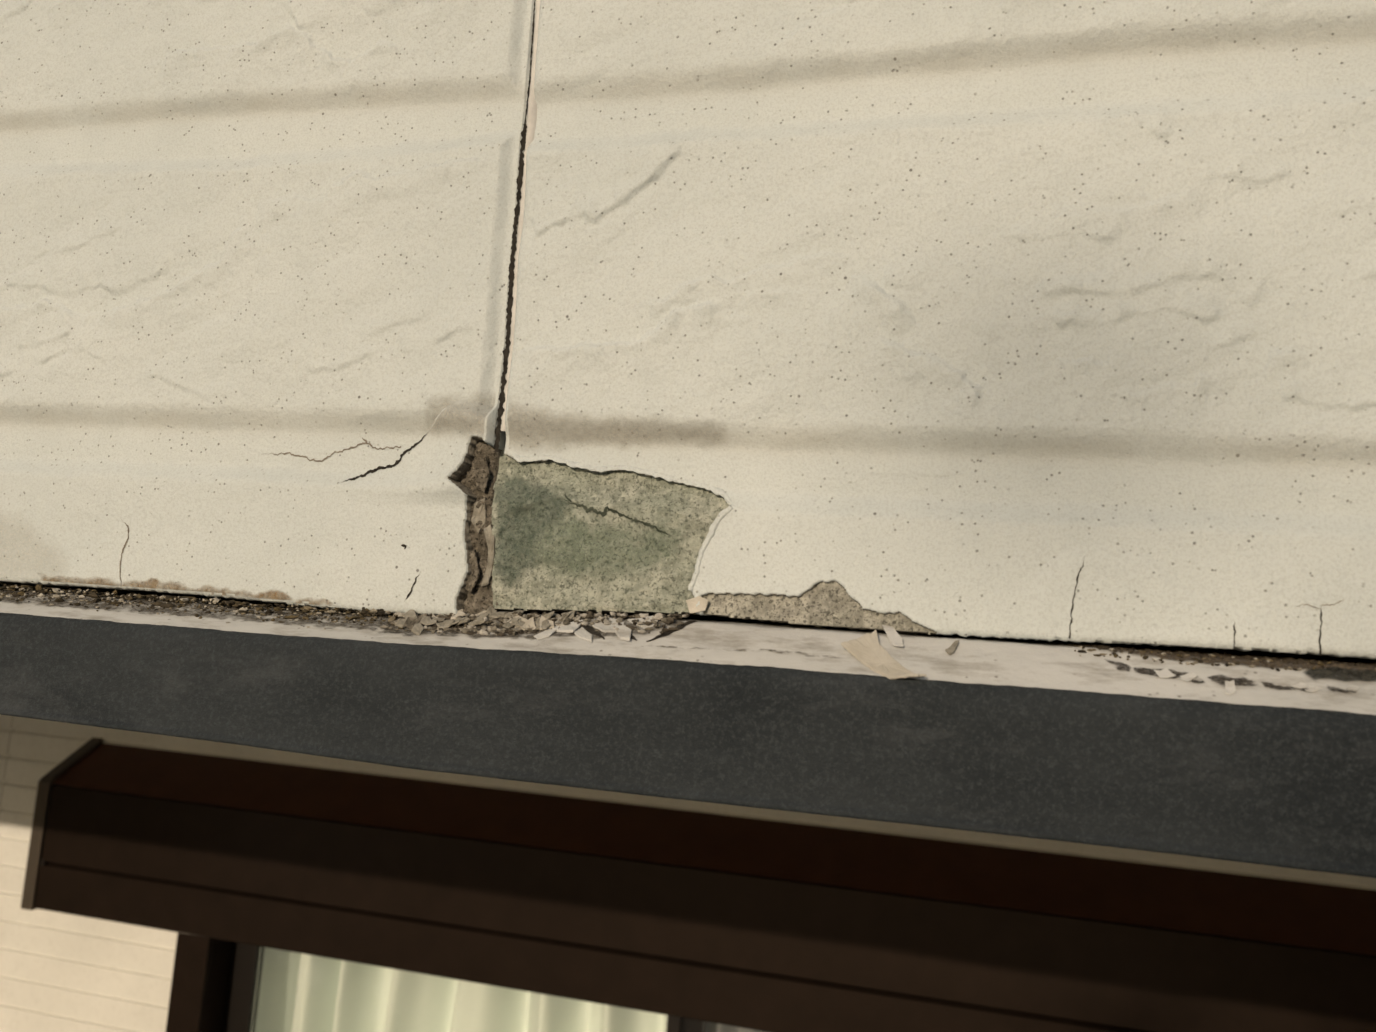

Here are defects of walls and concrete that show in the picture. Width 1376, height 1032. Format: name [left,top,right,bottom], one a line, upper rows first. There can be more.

crack [494,1,535,452]
crack [270,434,427,482]
peeling [460,439,936,647]
peeling [945,640,959,655]
peeling [1108,661,1359,695]